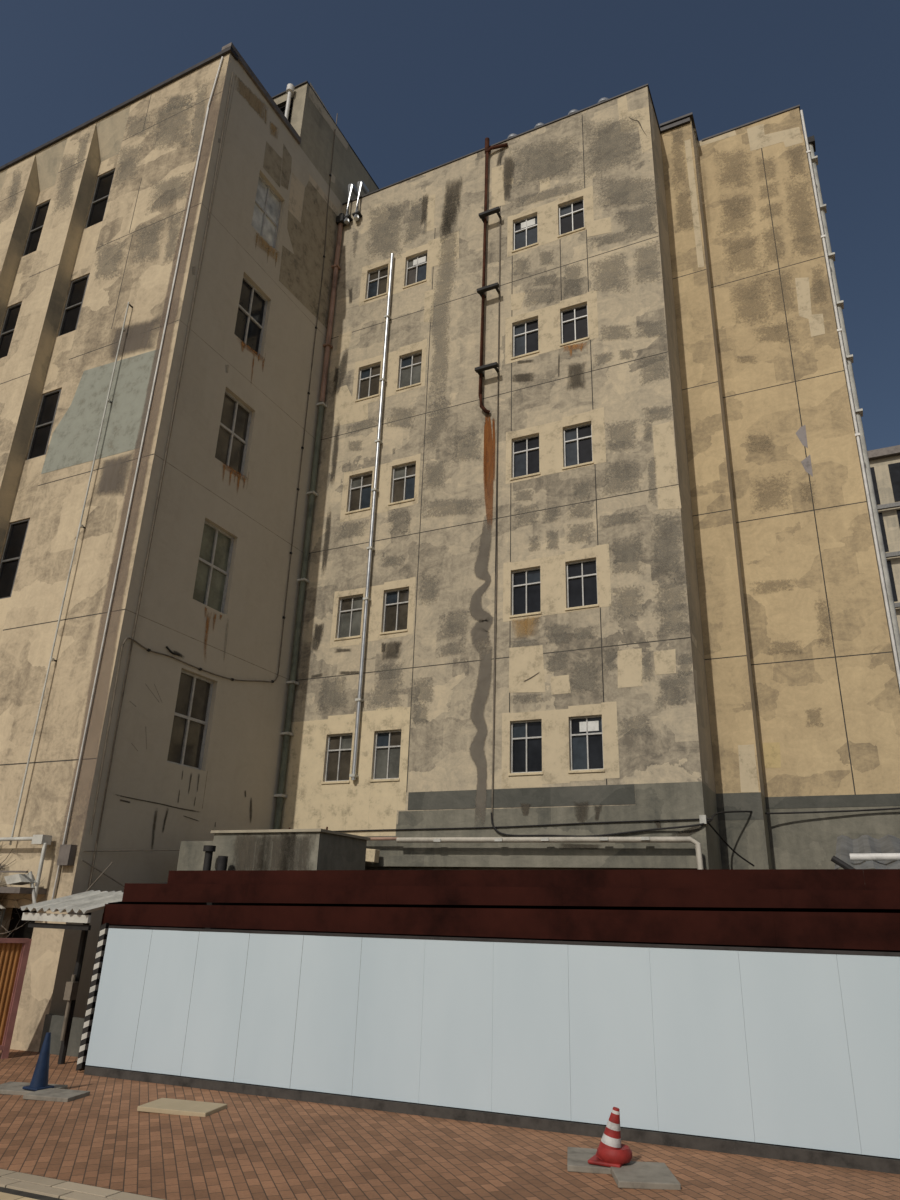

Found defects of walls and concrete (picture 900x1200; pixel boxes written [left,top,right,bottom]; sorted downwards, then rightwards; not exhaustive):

water stain [470,524,493,820]